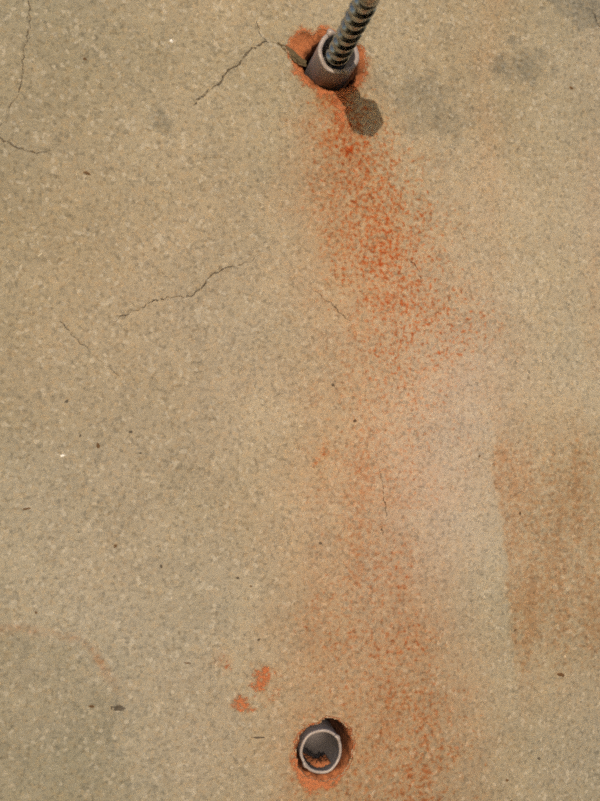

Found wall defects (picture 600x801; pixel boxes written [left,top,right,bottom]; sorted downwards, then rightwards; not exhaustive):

crack [0,1,47,153]
crack [195,22,277,104]
corrosion [292,66,368,138]
crack [114,260,253,322]
corrosion [251,666,270,692]
corrosion [290,739,340,795]